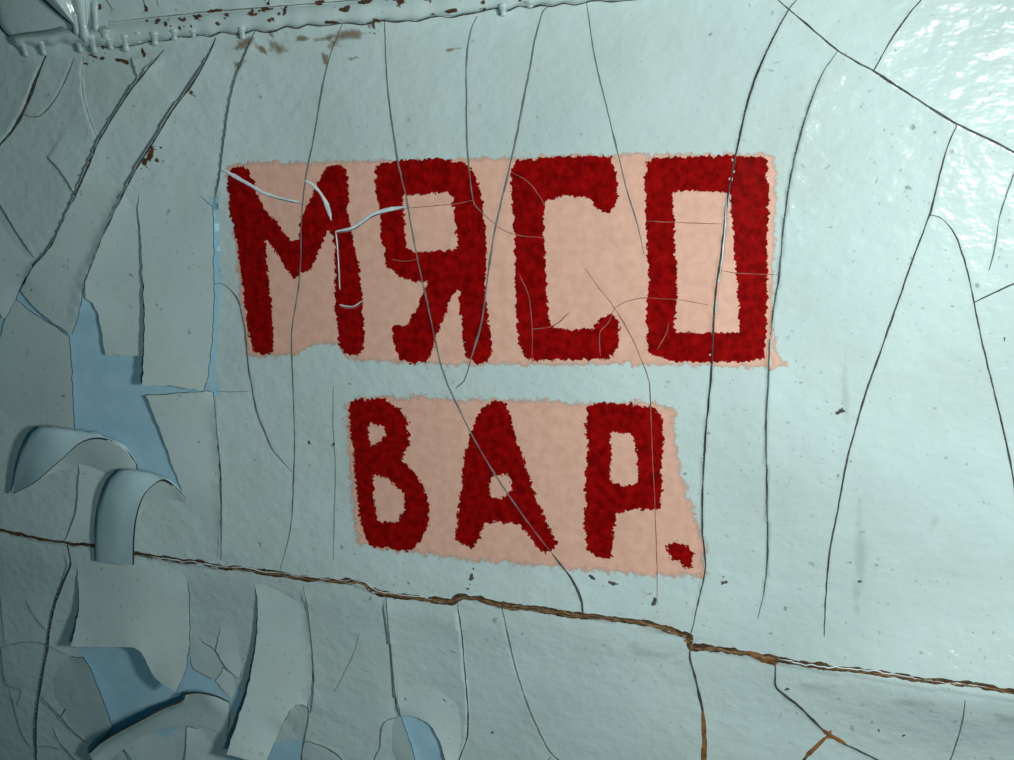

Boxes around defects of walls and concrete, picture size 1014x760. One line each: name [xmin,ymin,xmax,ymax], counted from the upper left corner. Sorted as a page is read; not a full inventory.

crack [0,50,164,223]
rust [144,5,229,30]
rust [237,39,282,53]
rust [247,0,288,34]
crack [214,22,371,250]
rust [325,0,374,44]
crack [335,35,548,548]
crack [703,0,1014,636]
peeling [0,177,342,760]
crack [134,254,1014,760]
crack [0,529,95,760]
peeling [392,680,461,760]